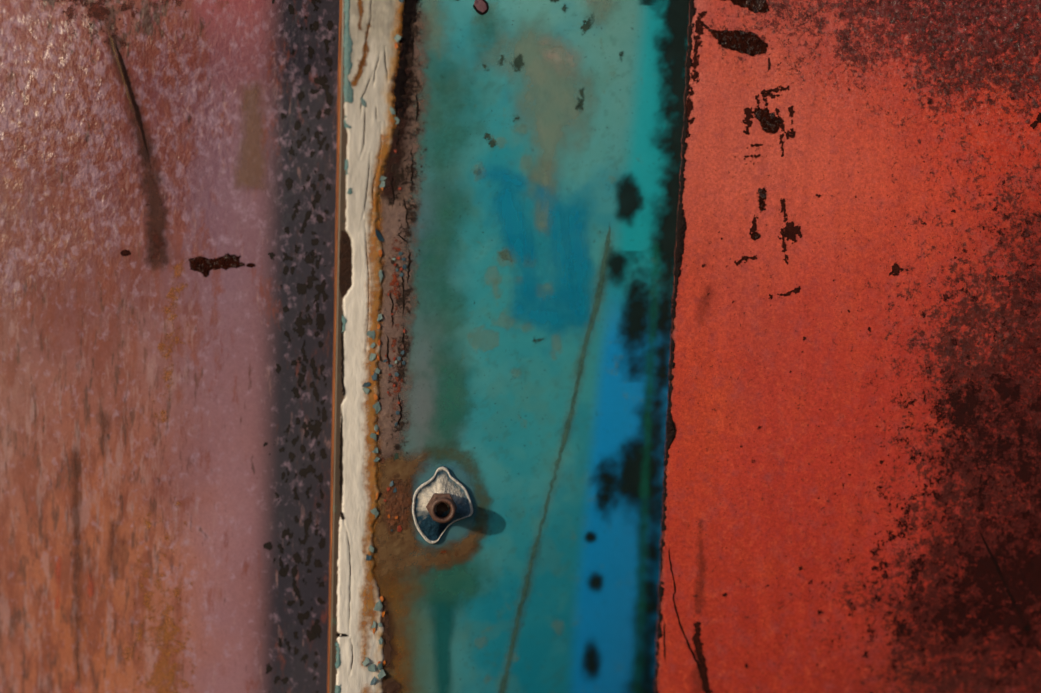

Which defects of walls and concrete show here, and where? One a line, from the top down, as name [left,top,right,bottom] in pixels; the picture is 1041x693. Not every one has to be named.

peeling [343,0,366,107]
spalling [703,23,771,70]
spalling [725,0,769,13]
spalling [742,85,795,165]
corrosion [56,0,187,422]
spalling [339,231,352,297]
spalling [749,188,767,241]
spalling [778,198,802,265]
peeling [362,314,382,462]
corrosion [360,1,491,693]
corrosion [125,536,190,693]
crack [663,550,712,693]